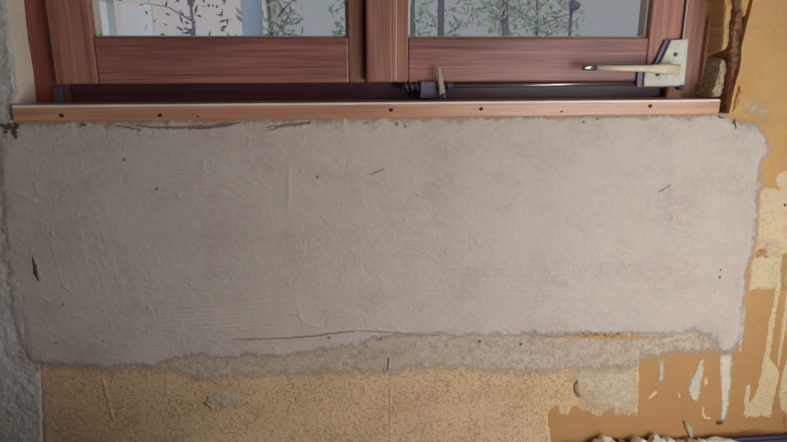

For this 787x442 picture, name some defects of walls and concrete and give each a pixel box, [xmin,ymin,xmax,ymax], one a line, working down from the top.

peeling [749,171,787,291]
crack [232,331,438,340]
peeling [573,378,584,397]